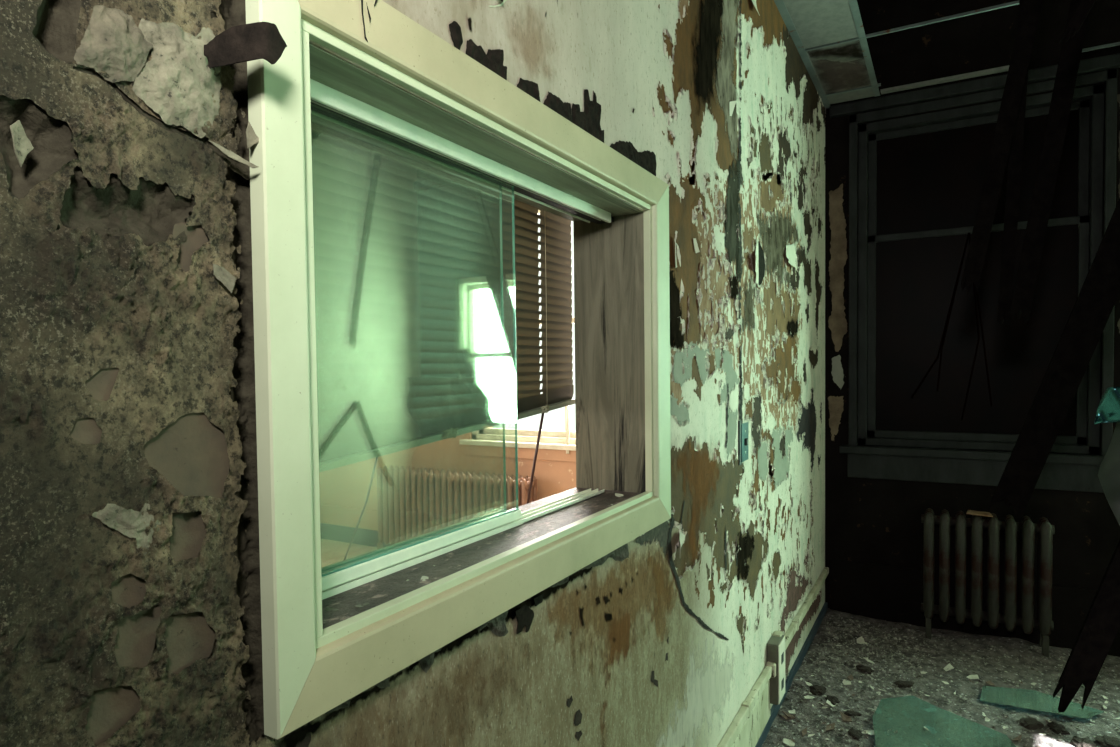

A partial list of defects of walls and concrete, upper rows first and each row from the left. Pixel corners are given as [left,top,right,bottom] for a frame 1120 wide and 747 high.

flaking render [32,0,81,69]
flaking render [0,95,196,246]
crack [68,61,250,180]
flaking render [204,0,311,747]
peeling [449,0,826,681]
water stain [283,661,419,747]
peeling [418,647,442,673]
water stain [434,626,489,658]
water stain [505,549,677,663]
crack [668,501,729,640]
crack [725,524,738,577]
water stain [736,529,755,581]